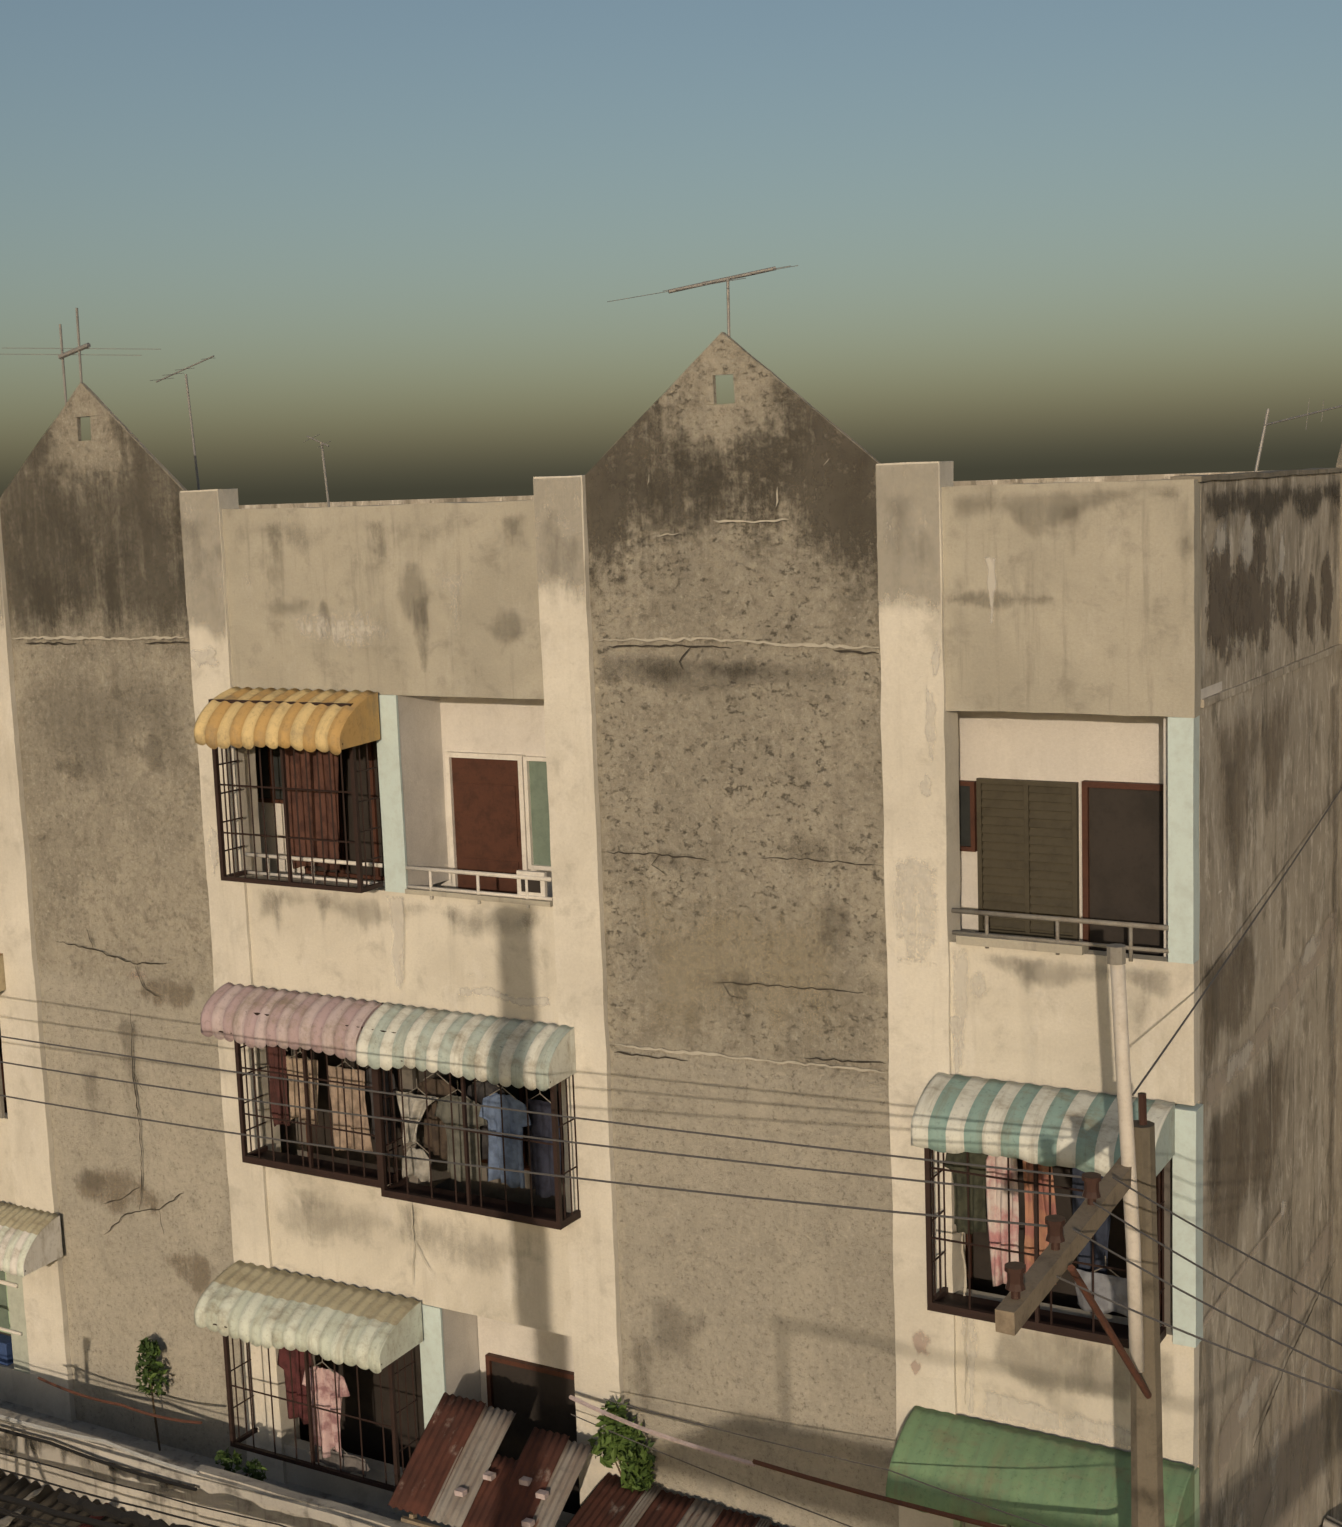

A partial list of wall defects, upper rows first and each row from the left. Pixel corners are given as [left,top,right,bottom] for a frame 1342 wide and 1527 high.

leakage [0,419,225,633]
leakage [533,382,941,606]
leakage [1208,483,1340,572]
crack [57,931,183,1234]